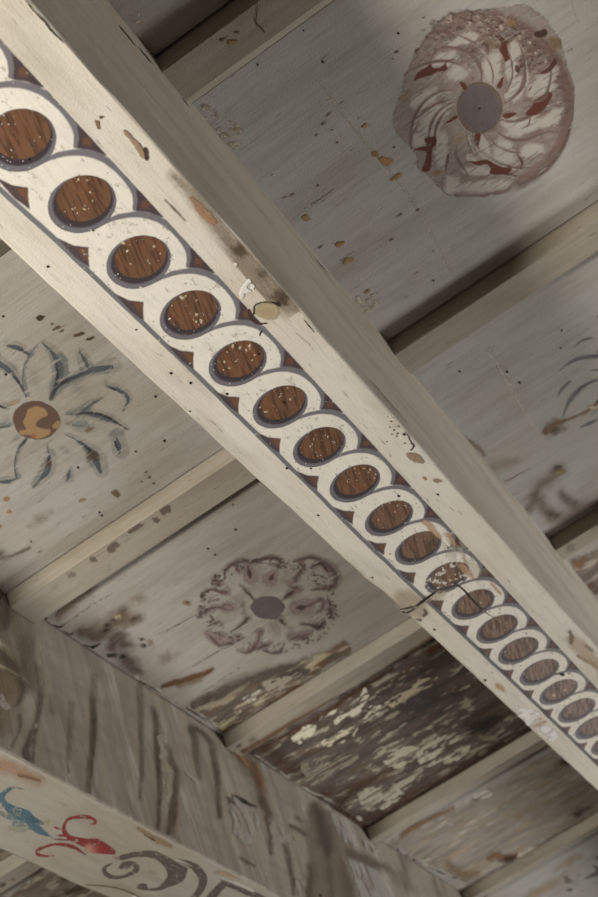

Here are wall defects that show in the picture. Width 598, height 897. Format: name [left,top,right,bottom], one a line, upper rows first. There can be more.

peeling [572,551,598,599]
crack [400,582,493,617]
peeling [190,642,351,733]
peeling [248,638,559,853]
peeling [349,859,395,897]